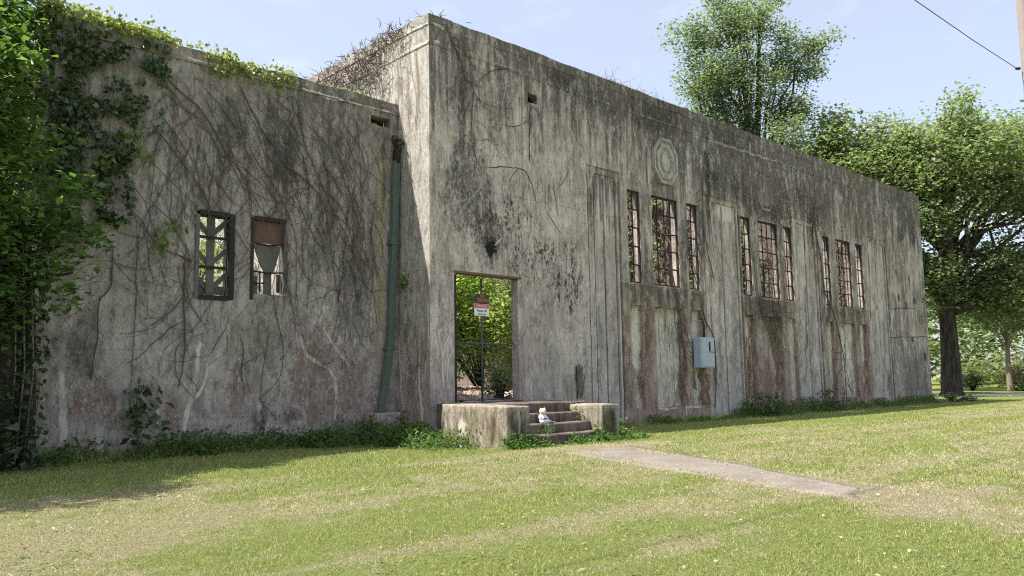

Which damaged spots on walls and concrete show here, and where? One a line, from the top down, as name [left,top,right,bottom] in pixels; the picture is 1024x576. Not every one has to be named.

water stain [445,134,506,253]
water stain [705,140,775,223]
water stain [183,341,208,436]